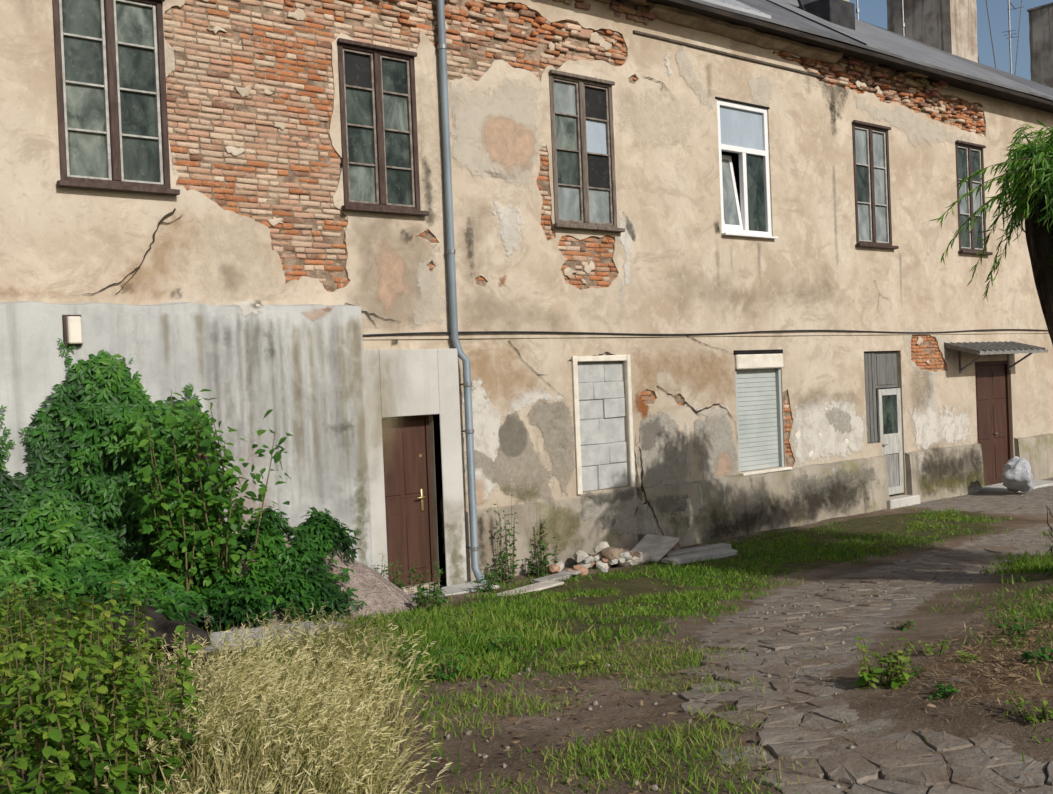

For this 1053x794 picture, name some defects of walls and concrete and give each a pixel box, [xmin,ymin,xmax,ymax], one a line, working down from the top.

flaking render [772,52,987,137]
flaking render [163,0,627,292]
crack [73,208,183,296]
peeling [462,377,562,504]
crack [634,436,664,536]
crack [657,386,738,438]
spalling [783,390,794,467]
water stain [709,395,875,542]
peeling [904,328,971,449]
water stain [919,450,982,490]